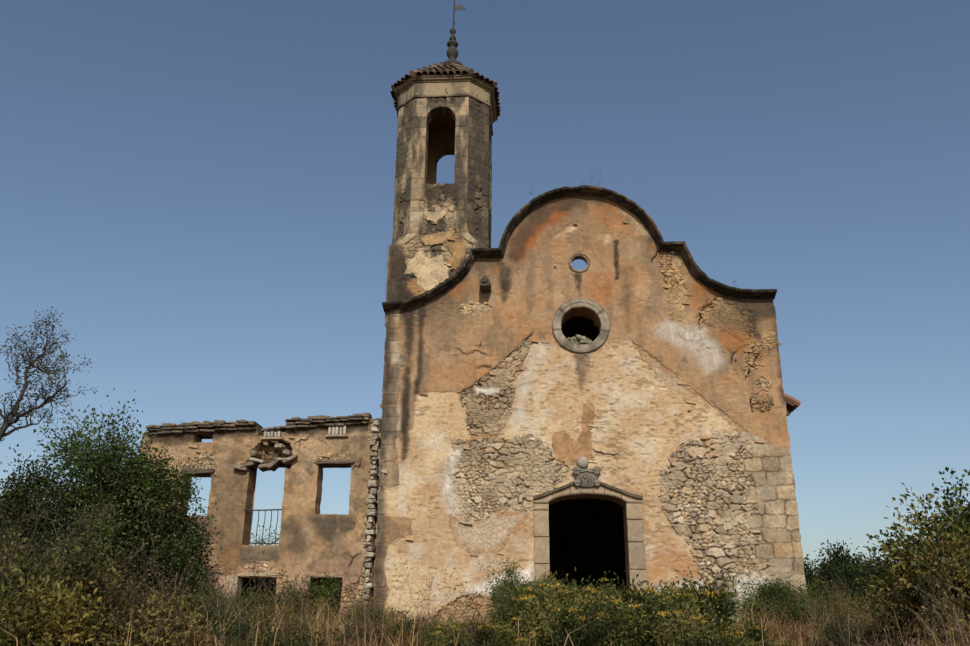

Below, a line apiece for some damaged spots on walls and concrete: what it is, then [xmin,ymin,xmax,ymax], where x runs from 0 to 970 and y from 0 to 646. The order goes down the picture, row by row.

flaking render [404,204,468,297]
flaking render [458,300,492,316]
flaking render [660,251,782,413]
flaking render [254,430,352,487]
flaking render [340,332,808,624]
water stain [737,575,766,604]